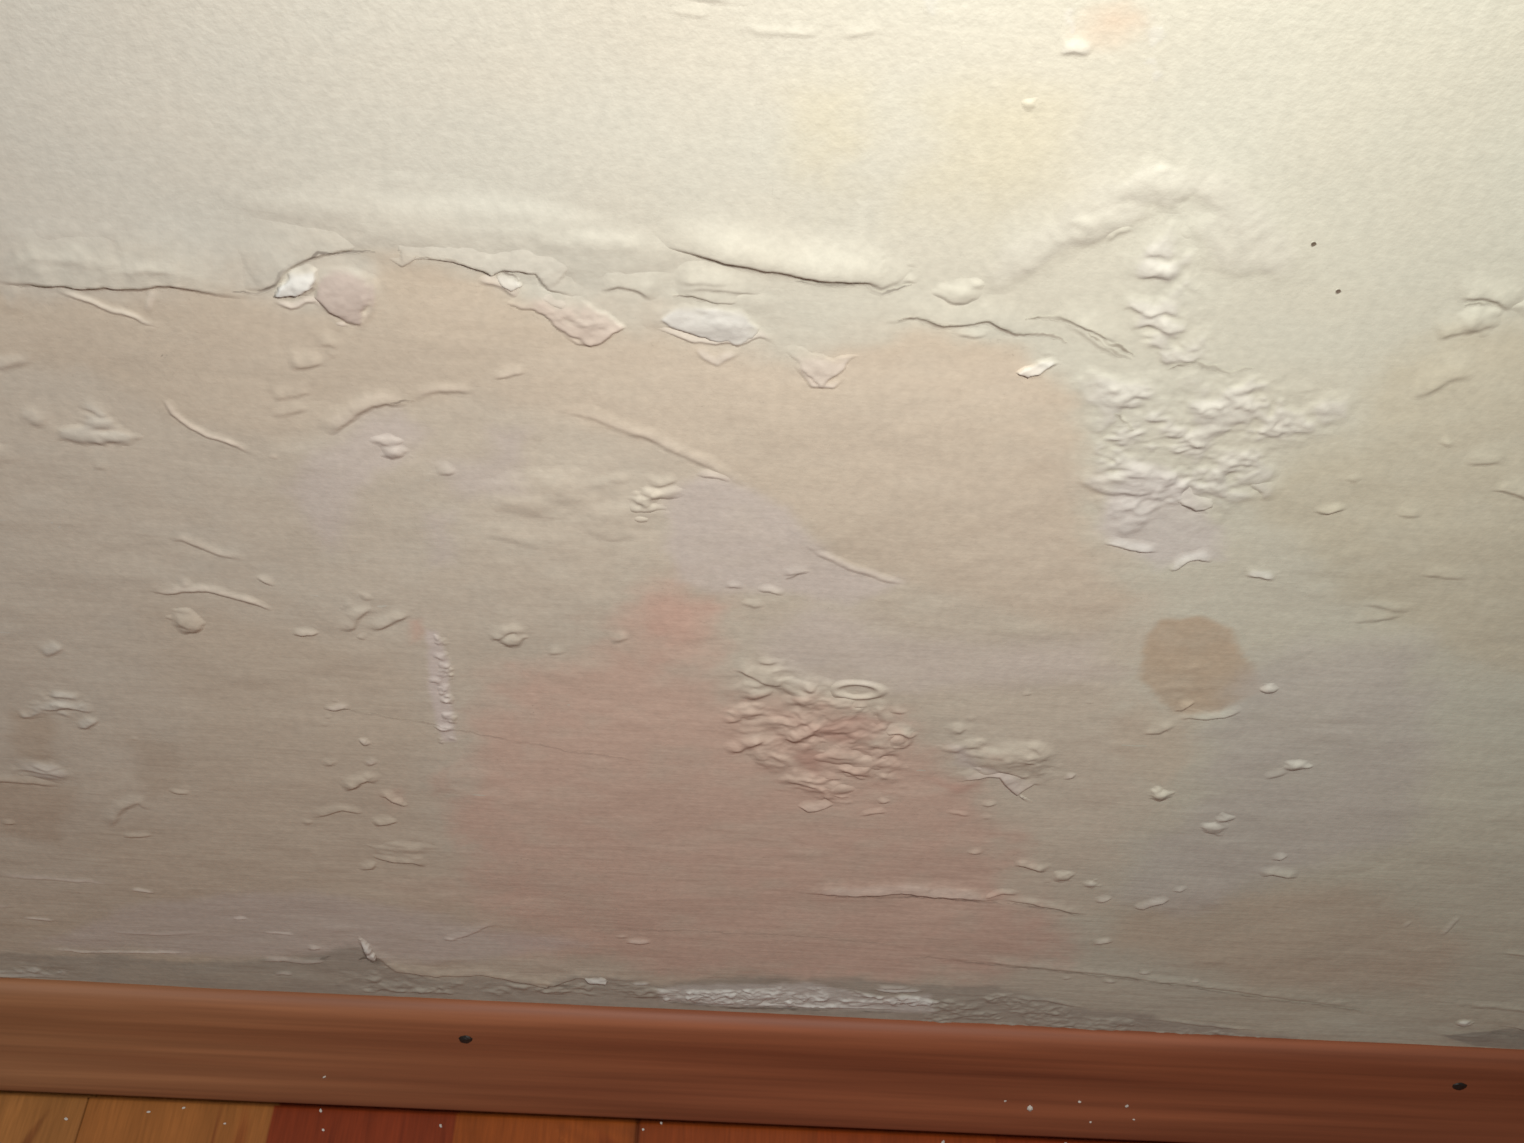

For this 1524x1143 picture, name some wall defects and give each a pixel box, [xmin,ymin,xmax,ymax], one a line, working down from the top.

peeling [0,184,859,390]
leakage [0,255,1498,1010]